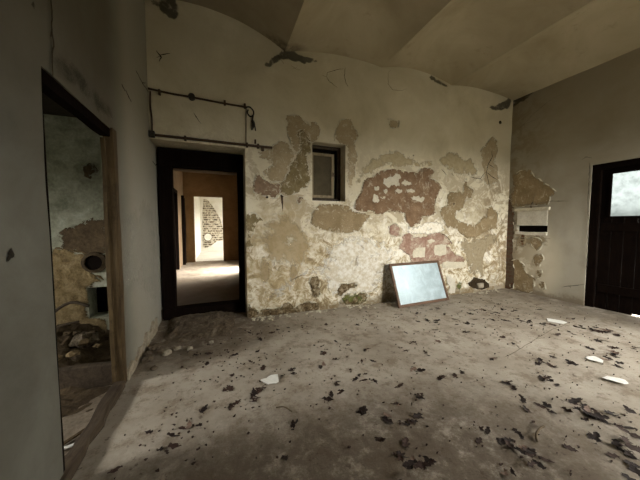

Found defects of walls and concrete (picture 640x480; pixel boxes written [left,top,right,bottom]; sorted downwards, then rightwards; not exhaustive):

peeling [253,114,320,211]
peeling [480,137,499,186]
peeling [52,216,107,330]
spalling [248,275,321,318]
peeling [310,167,498,294]
peeling [505,170,556,293]